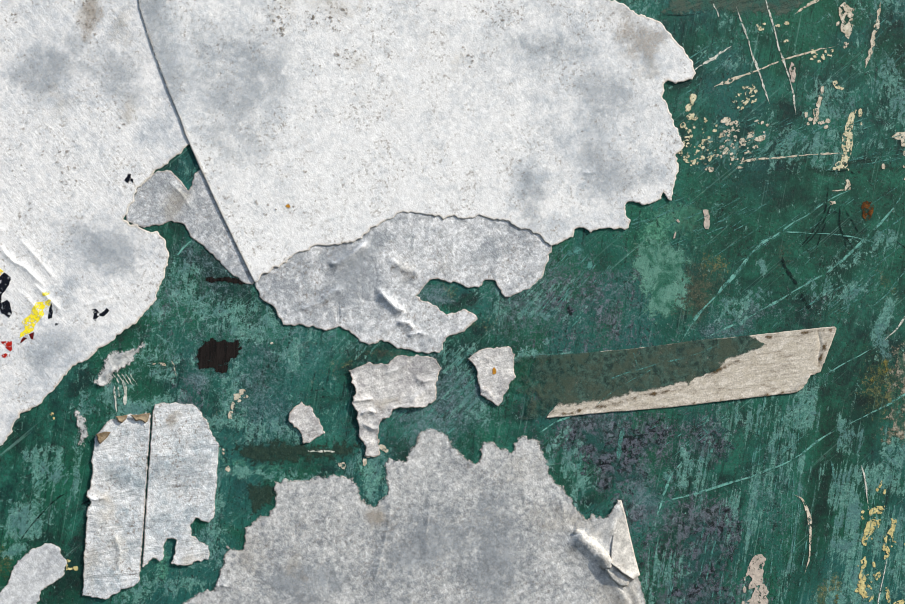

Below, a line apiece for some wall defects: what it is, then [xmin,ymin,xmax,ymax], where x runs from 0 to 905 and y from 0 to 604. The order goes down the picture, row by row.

peeling [662,0,807,31]
peeling [810,2,855,62]
peeling [679,94,769,172]
peeling [733,85,758,110]
peeling [805,81,844,129]
peeling [833,108,862,189]
corrosion [861,201,874,219]
peeling [228,389,248,419]
peeling [556,414,674,502]
peeling [665,503,769,604]
peeling [855,506,905,602]